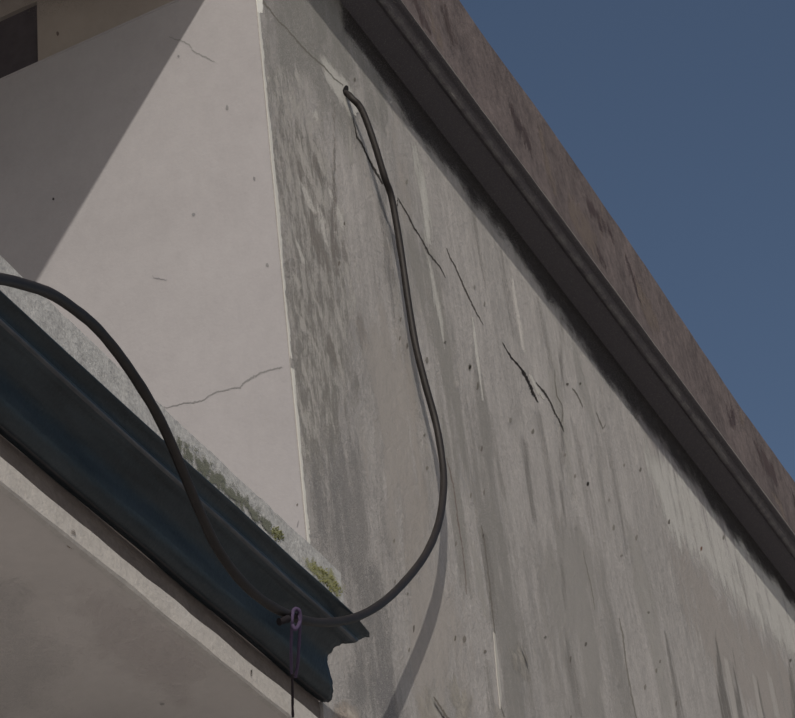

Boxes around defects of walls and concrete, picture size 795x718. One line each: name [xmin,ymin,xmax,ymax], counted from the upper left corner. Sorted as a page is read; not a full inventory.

crack [263,0,343,86]
crack [353,119,383,184]
crack [397,200,483,324]
crack [165,367,282,408]
damp [262,0,795,718]
crack [502,342,605,432]